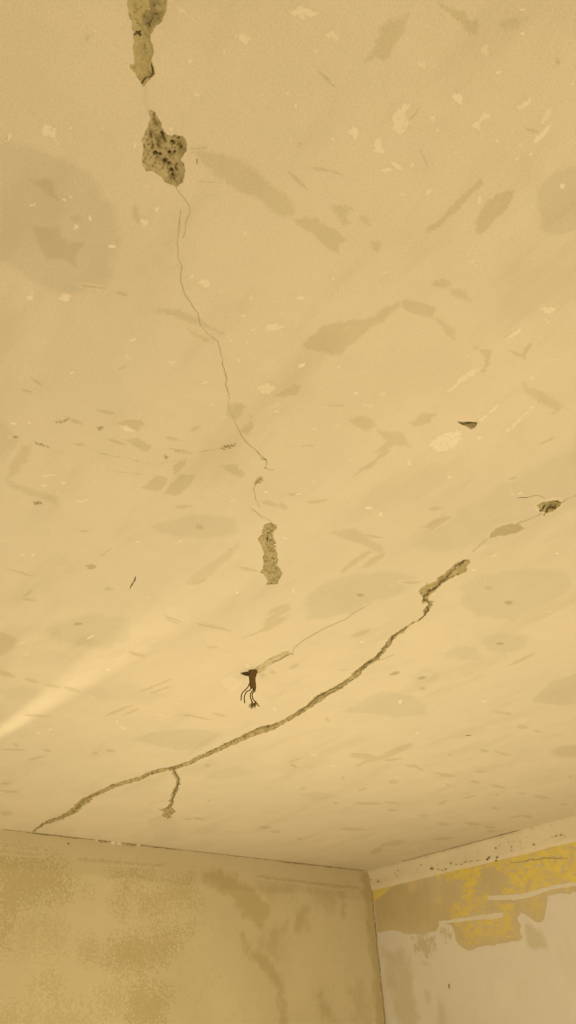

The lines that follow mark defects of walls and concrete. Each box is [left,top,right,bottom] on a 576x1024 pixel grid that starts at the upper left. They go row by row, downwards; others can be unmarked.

flaking render [127,0,167,87]
flaking render [141,110,187,187]
flaking render [258,523,282,585]
crack [4,541,485,1024]
leakage [0,833,514,1024]
peeling [437,842,576,951]